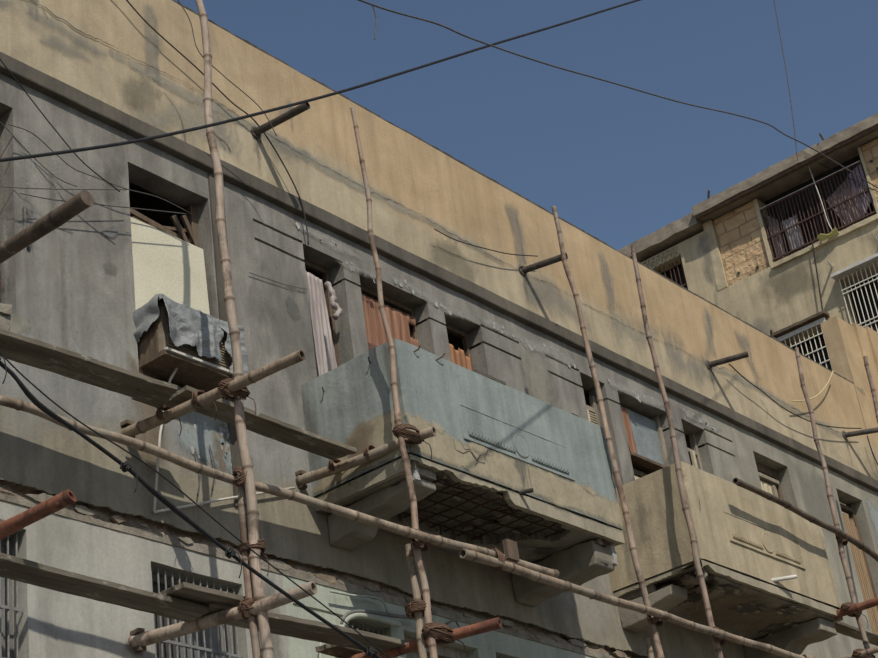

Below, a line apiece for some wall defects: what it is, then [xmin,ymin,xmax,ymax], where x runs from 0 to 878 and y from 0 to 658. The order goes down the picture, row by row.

spalling [0,470,242,563]
peeling [178,422,232,474]
peeling [314,408,623,554]
spalling [260,544,671,658]
spalling [632,566,715,596]